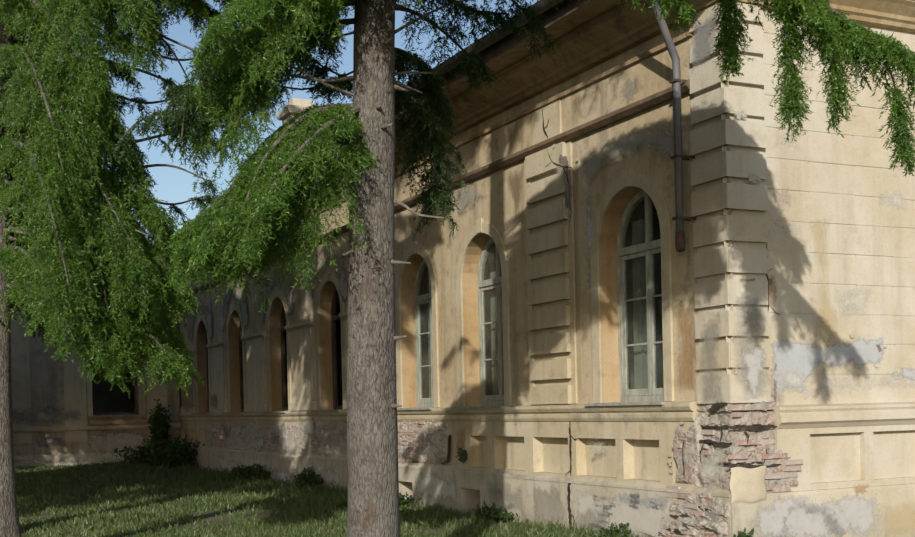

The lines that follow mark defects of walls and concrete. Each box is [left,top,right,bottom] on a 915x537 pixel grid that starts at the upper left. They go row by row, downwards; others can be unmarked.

crack [542,111,576,227]
crack [766,245,781,315]
spalling [248,416,347,458]
spalling [398,420,456,501]
crack [565,422,577,525]
spalling [576,334,887,537]